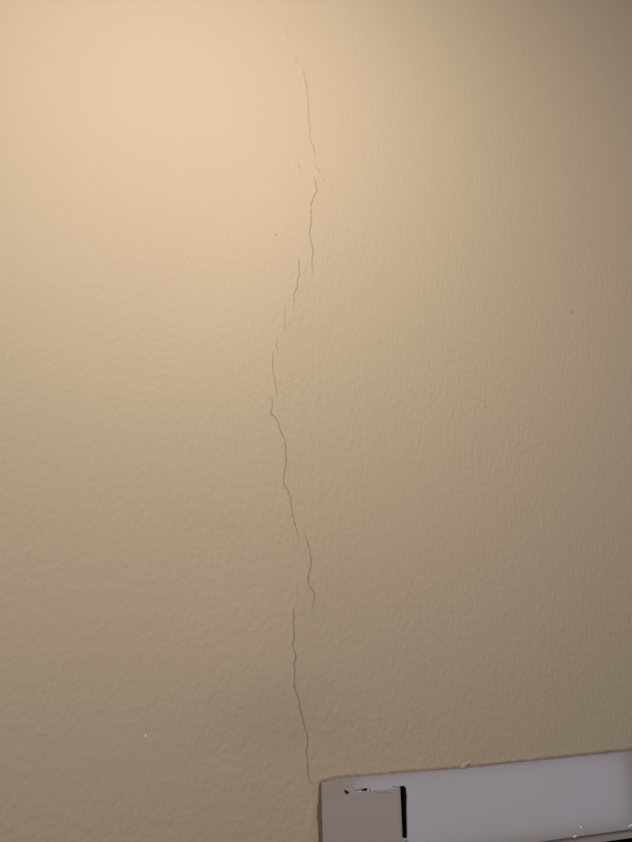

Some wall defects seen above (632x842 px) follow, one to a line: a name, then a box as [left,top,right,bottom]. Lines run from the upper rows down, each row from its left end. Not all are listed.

crack [266,65,330,842]